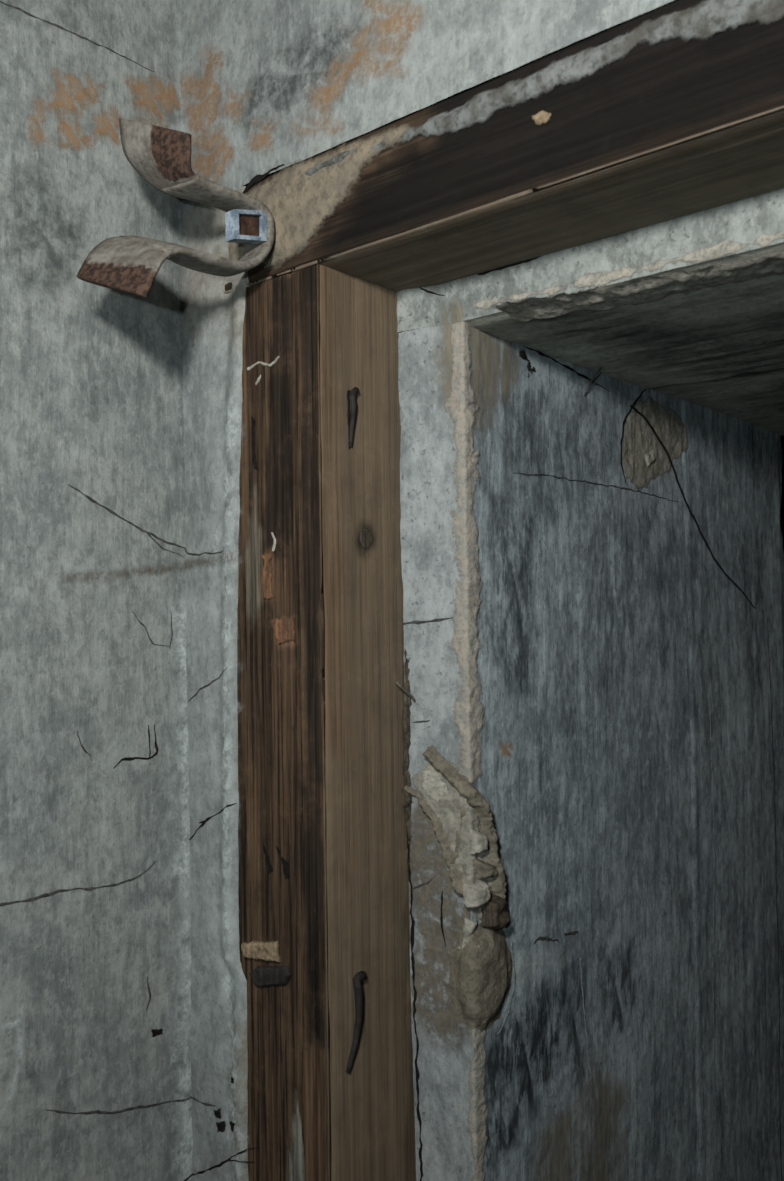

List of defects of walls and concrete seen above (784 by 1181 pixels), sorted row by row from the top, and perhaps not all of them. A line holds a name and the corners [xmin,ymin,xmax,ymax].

rust [315,0,420,125]
rust [31,73,119,148]
rust [127,54,241,179]
crack [519,347,610,392]
spalling [620,390,688,490]
crack [68,484,224,557]
crack [77,725,158,768]
crack [0,861,156,906]
crack [189,803,236,840]
spalling [404,746,511,949]
crack [45,1096,215,1115]
crack [184,1147,258,1181]